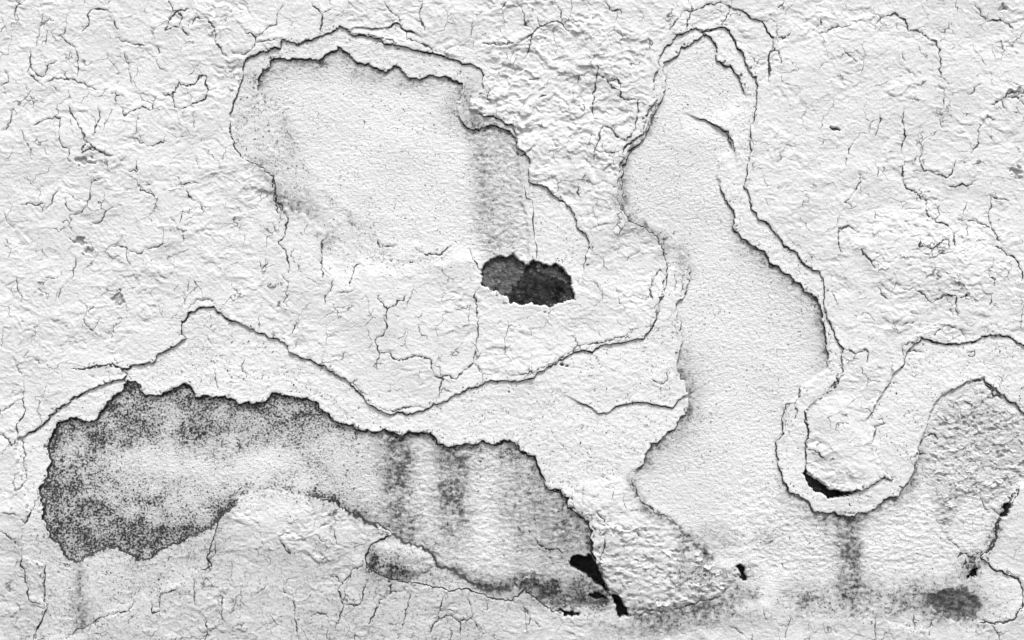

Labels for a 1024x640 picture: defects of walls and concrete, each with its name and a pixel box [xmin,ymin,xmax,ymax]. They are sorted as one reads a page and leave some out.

crack [0,0,283,196]
peeling [225,22,594,308]
crack [574,66,639,158]
crack [837,6,1024,408]
crack [320,235,480,418]
crack [0,359,46,638]
peeling [34,375,607,609]
water stain [353,430,474,567]
water stain [453,448,612,613]
spalling [612,594,629,618]
spalling [803,471,857,499]
water stain [780,449,980,620]